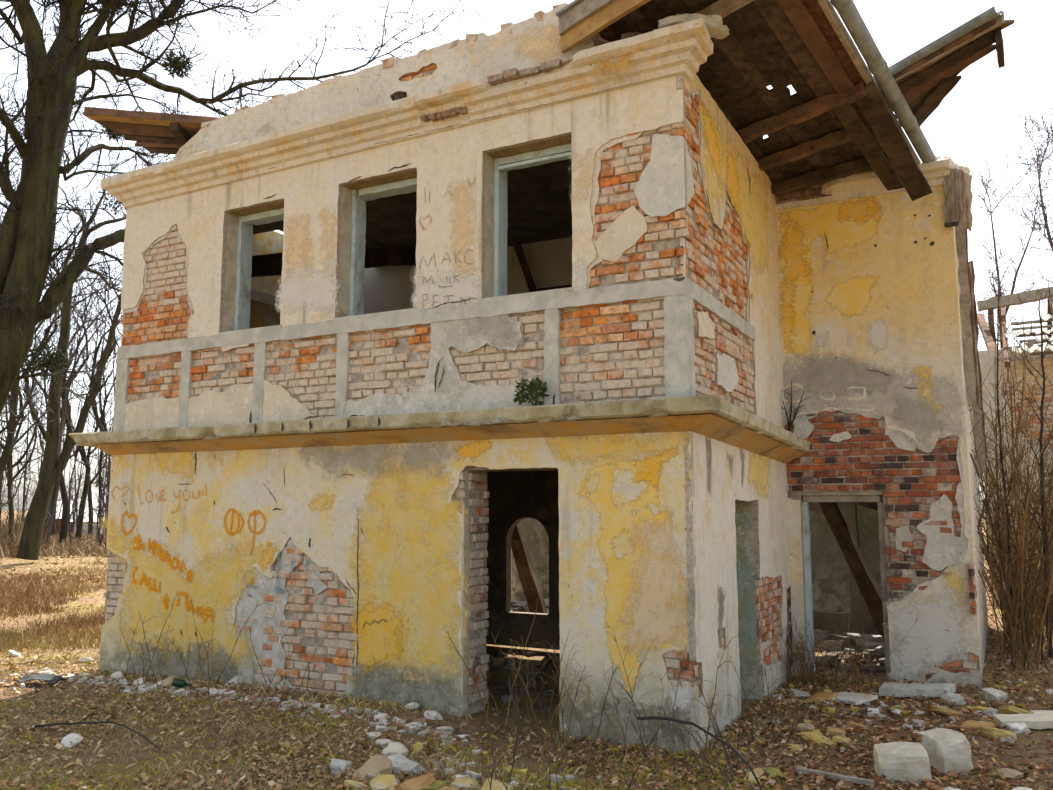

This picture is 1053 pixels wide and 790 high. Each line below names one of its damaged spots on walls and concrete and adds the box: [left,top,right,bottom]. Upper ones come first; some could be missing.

flaking render [121,224,195,346]
spalling [441,418,522,426]
flaking render [572,87,832,323]
peeling [780,278,816,356]
peeling [826,275,888,351]
water stain [778,215,966,447]
peeling [102,440,492,697]
crack [345,507,363,693]
peeling [547,432,701,710]
flaking render [755,576,791,665]
flaking render [784,409,979,681]